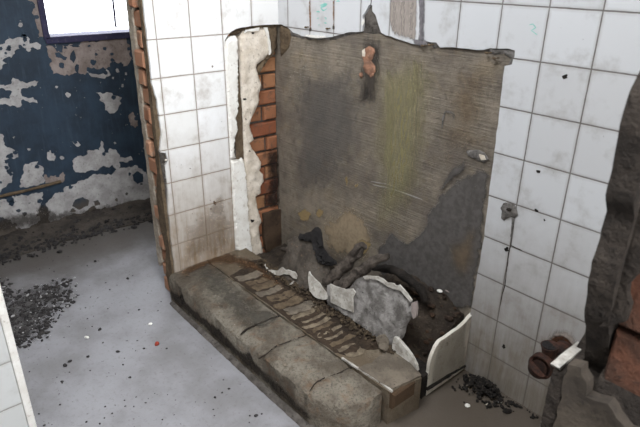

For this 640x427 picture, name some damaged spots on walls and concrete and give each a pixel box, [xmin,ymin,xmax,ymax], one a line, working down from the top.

peeling [0,0,132,79]
spalling [290,28,361,40]
spalling [359,46,376,78]
water stain [361,44,379,101]
spalling [484,48,515,65]
peeling [0,78,38,107]
peeling [98,92,122,114]
peeling [236,27,271,255]
peeling [0,134,150,229]
crack [240,315,280,335]
flaking render [604,274,640,396]
crack [309,367,352,392]